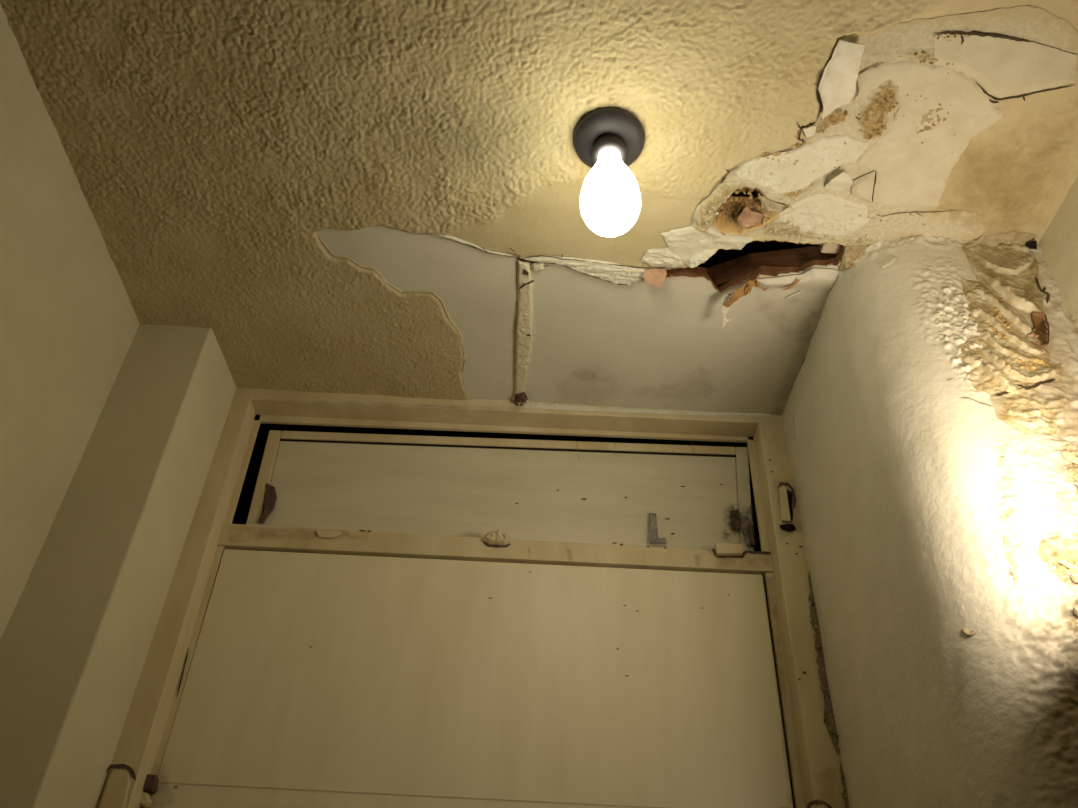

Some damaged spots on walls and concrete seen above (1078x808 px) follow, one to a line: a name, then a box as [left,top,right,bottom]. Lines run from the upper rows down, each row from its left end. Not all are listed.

peeling [316,6,1078,435]